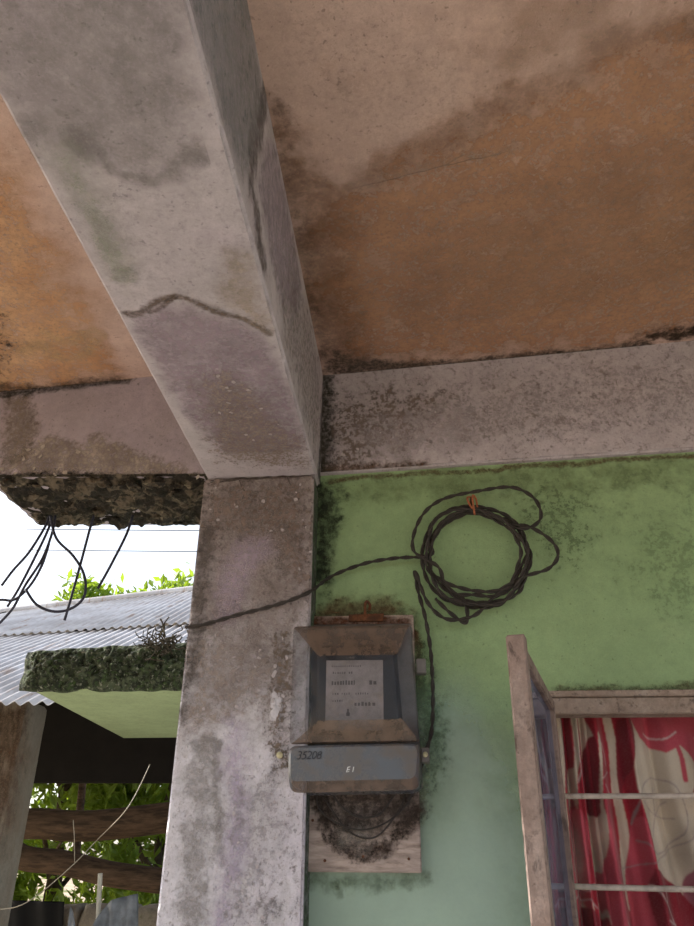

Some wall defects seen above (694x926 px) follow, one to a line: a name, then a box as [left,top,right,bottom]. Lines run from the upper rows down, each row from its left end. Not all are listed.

damp [193,0,694,374]
damp [0,177,120,464]
spalling [0,433,217,624]
damp [311,478,348,626]
damp [303,673,531,926]